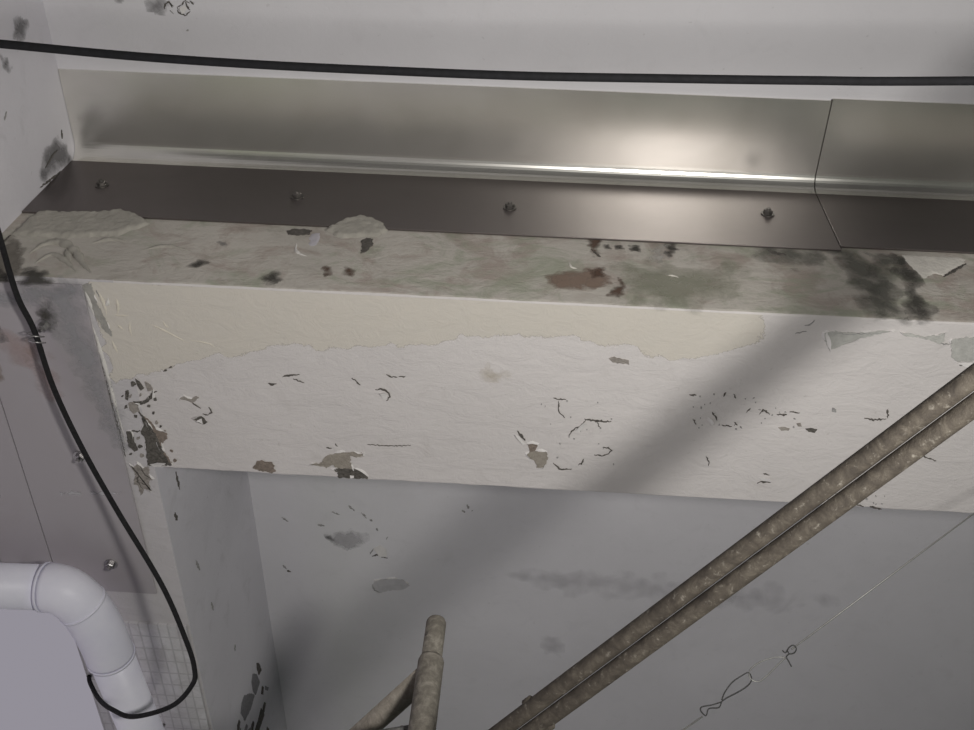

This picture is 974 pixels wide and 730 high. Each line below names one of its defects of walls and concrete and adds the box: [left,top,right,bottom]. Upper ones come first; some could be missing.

spalling [361,238,374,253]
rust [548,239,625,297]
leakage [833,251,929,319]
spalling [82,283,112,336]
peeling [821,330,974,367]
peeling [176,395,212,425]
peeling [689,392,817,433]
peeling [121,378,177,496]
spalling [253,460,276,473]
spalling [309,444,369,479]
spalling [515,431,584,470]
spalling [237,663,269,730]